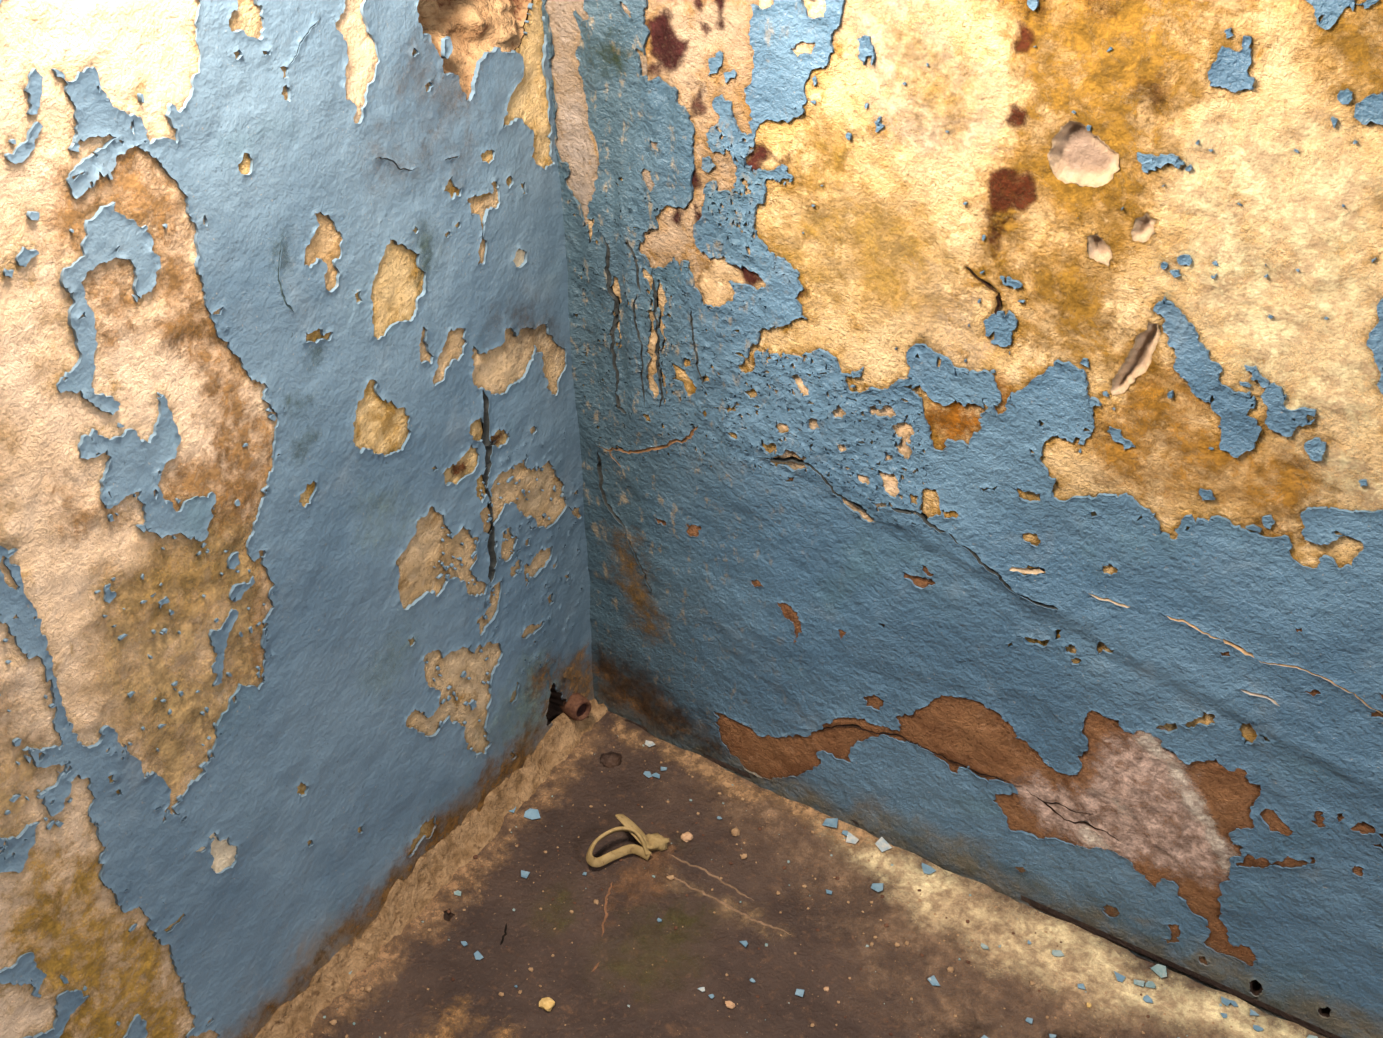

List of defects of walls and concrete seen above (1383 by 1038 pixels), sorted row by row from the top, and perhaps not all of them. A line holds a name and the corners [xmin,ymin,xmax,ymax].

peeling [444,176,525,264]
peeling [355,240,629,395]
peeling [621,0,1383,568]
peeling [0,0,277,1038]
peeling [353,379,409,456]
peeling [396,419,581,753]
crack [481,390,497,582]
peeling [904,565,935,588]
peeling [1008,629,1082,664]
peeling [714,694,1316,966]
efflorescence [1015,728,1232,885]
peeling [1311,811,1383,848]